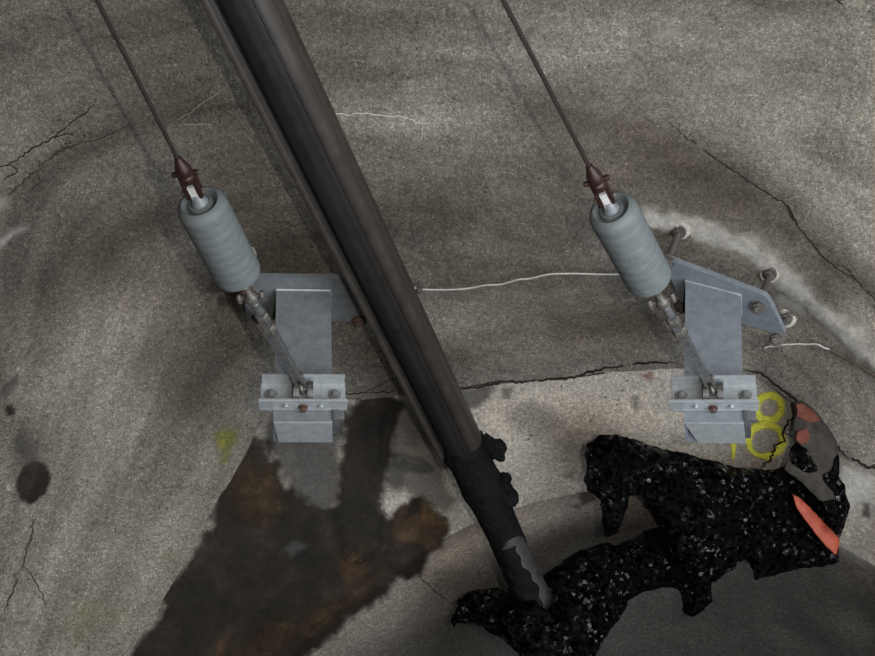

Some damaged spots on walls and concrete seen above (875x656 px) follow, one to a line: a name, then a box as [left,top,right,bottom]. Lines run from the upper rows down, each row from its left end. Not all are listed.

crack [0,104,127,206]
crack [669,122,874,299]
damp [643,209,875,369]
crack [345,384,395,395]
crack [460,361,678,390]
crack [744,369,798,468]
damp [6,438,50,504]
rust [387,497,449,580]